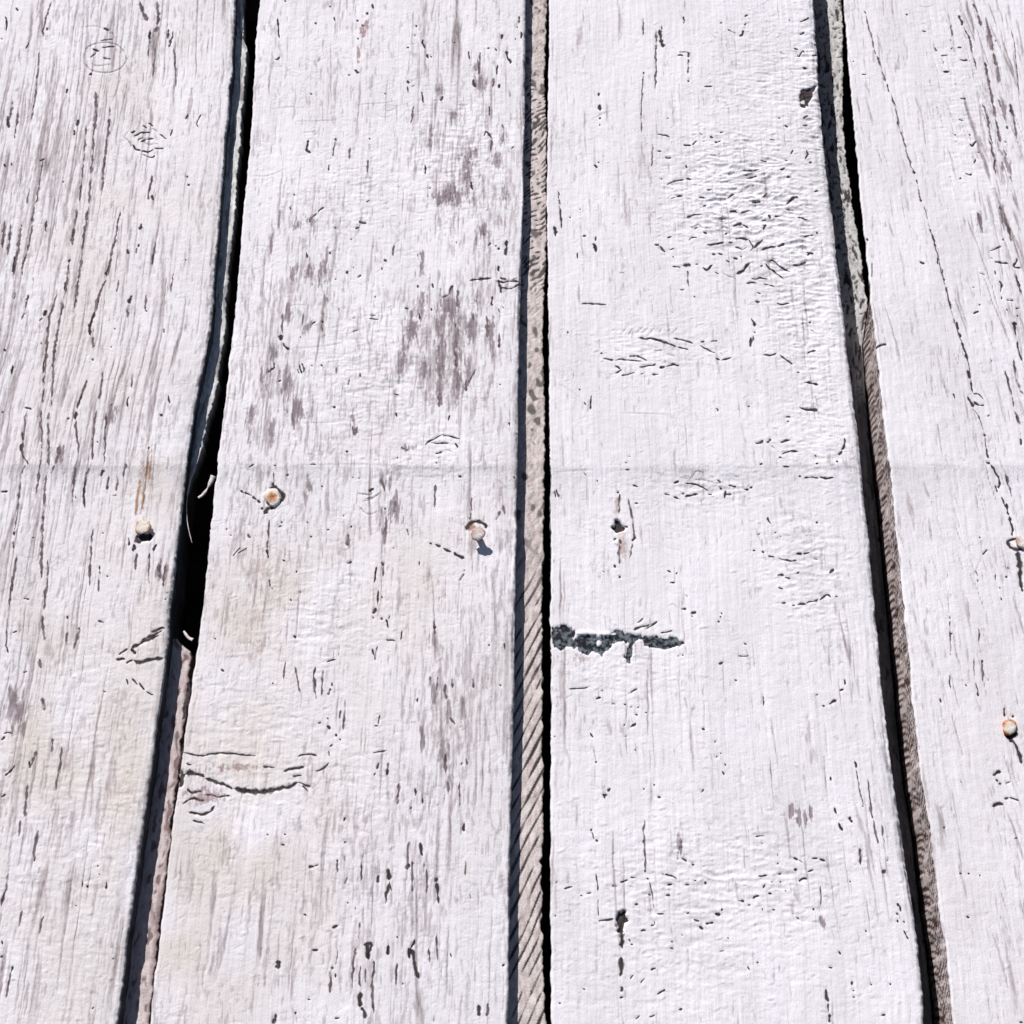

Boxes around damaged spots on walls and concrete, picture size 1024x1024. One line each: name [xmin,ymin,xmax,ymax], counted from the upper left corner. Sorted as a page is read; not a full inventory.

corrosion [135,456,151,514]
spalling [551,618,684,663]
crack [178,654,345,824]